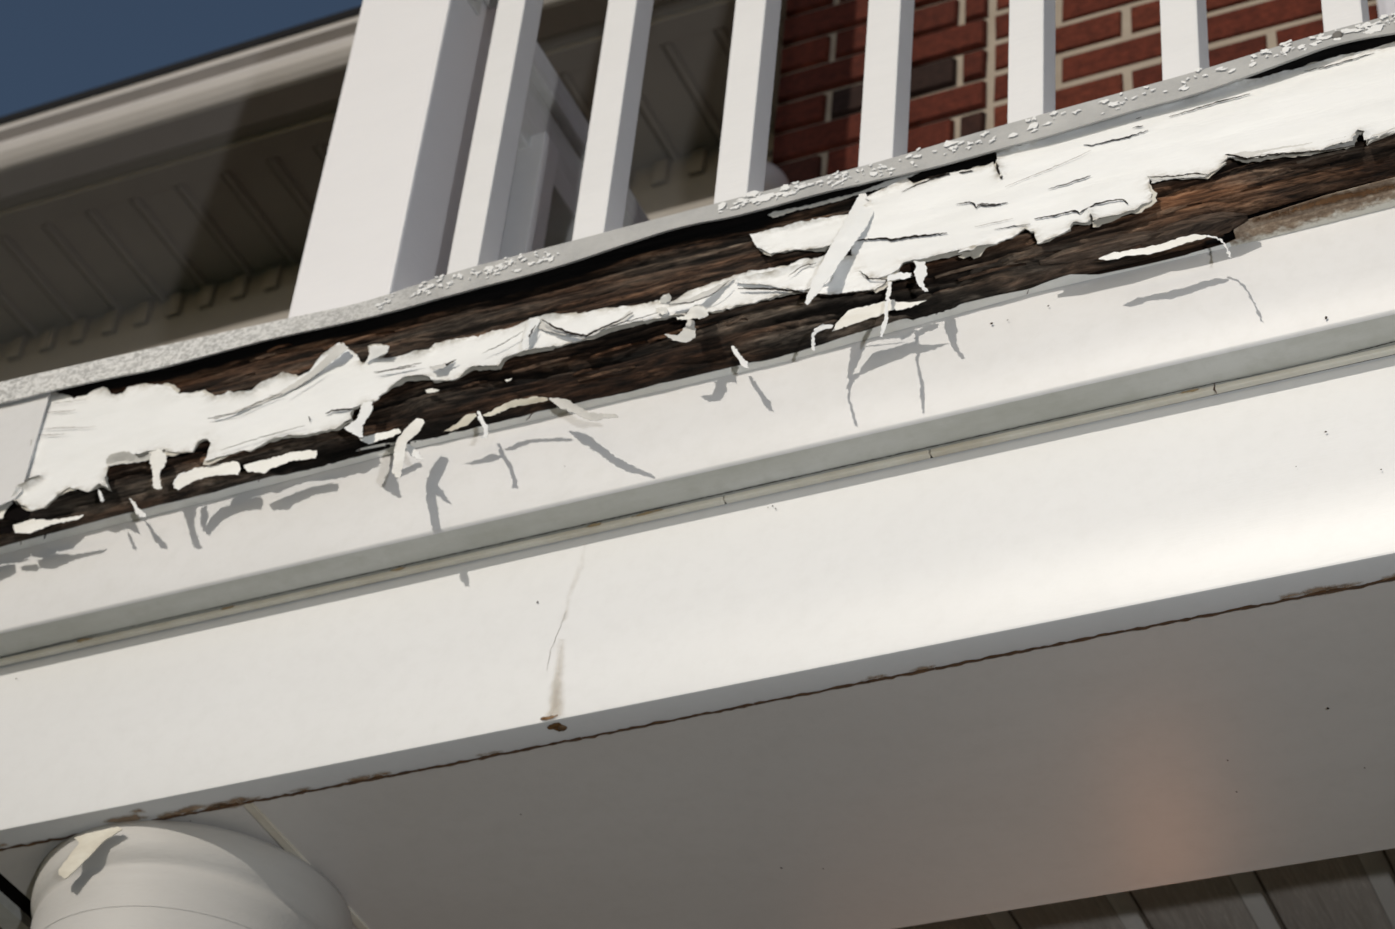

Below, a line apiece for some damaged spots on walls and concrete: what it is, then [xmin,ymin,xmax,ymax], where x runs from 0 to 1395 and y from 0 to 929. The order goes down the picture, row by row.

crack [1306,53,1373,71]
peeling [0,13,1395,555]
crack [377,94,1354,373]
crack [0,341,1395,658]
leakage [540,715,567,732]